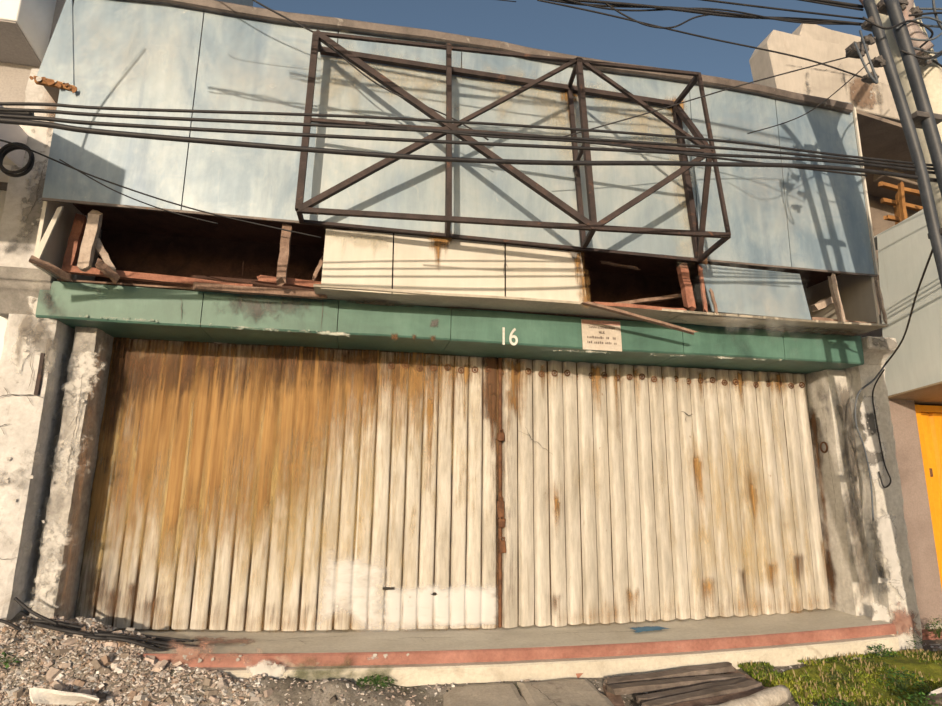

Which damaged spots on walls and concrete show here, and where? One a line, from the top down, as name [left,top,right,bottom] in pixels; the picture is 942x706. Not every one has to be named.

rust [430,233,453,264]
flaking render [10,296,56,373]
crack [0,353,43,405]
flaking render [61,350,104,417]
rust [592,367,618,396]
crack [66,375,83,483]
rust [79,337,469,556]
rust [694,458,702,490]
rust [810,411,826,515]
leakage [839,386,889,596]
rust [823,527,836,602]